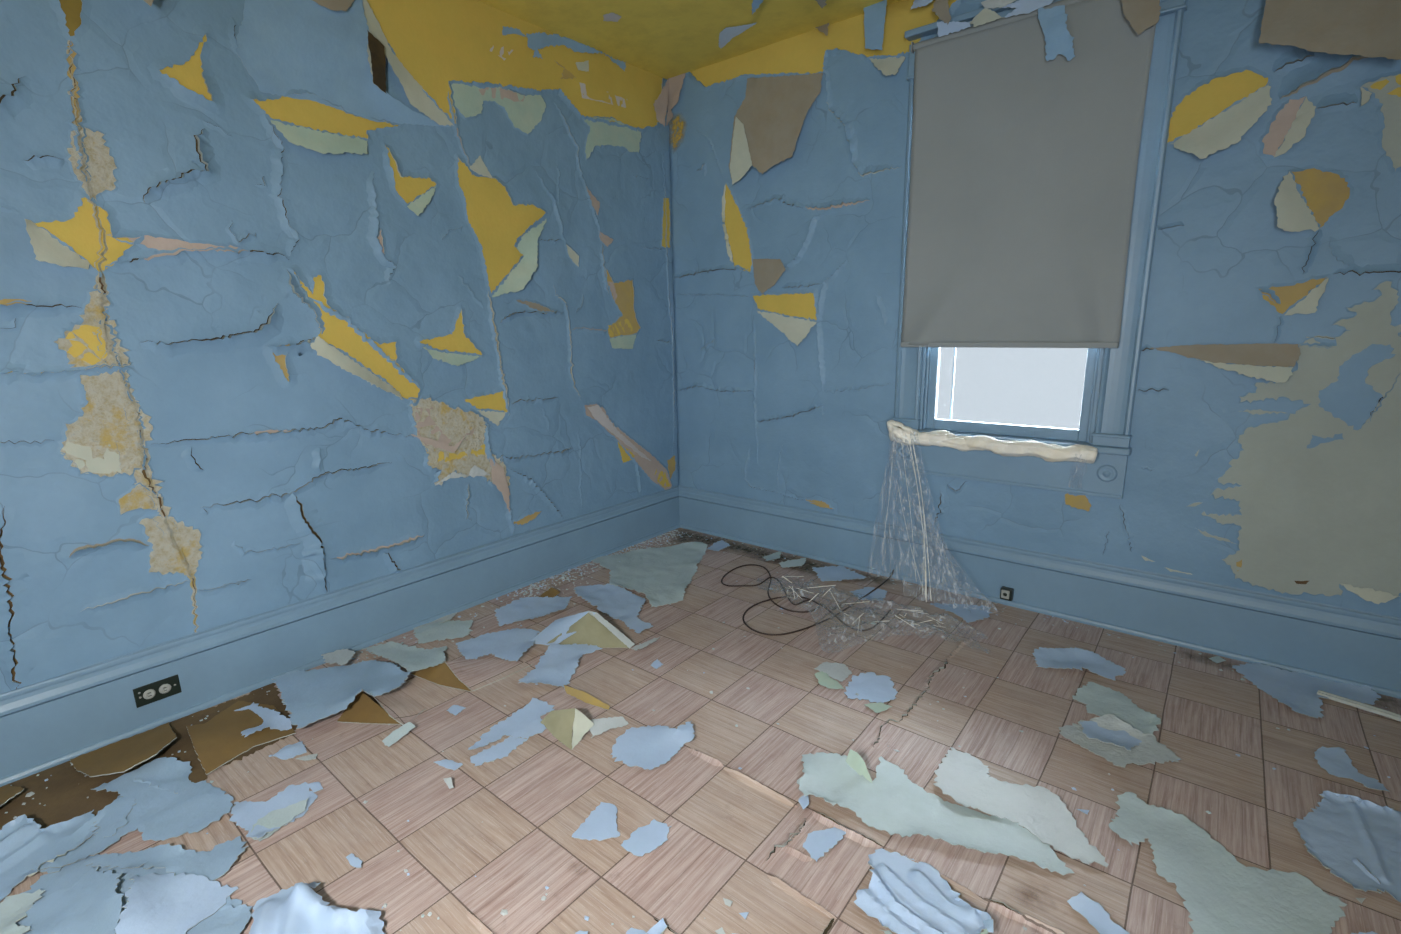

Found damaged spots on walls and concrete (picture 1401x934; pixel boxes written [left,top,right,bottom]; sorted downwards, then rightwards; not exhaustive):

flaking render [367,0,986,161]
peeling [1038,5,1075,61]
peeling [1121,0,1161,35]
crack [0,40,414,633]
peeling [406,394,514,536]
peeling [605,267,642,349]
flaking render [1189,279,1401,604]
crack [1297,229,1401,281]
crack [1362,372,1401,425]
crack [0,506,44,692]